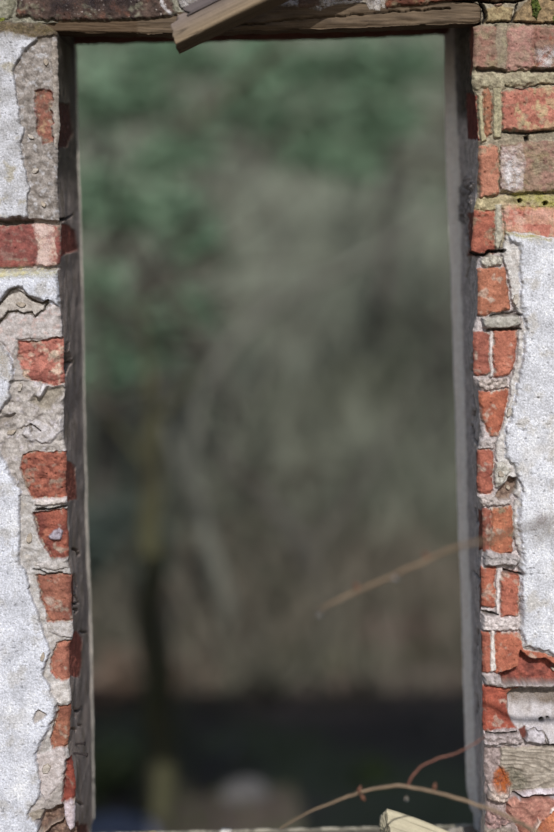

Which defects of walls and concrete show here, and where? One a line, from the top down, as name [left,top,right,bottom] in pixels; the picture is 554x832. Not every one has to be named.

crack [454,0,554,25]
flaking render [0,289,49,320]
crack [0,288,49,324]
flaking render [0,381,67,484]
flaking render [494,232,554,744]
flaking render [19,495,77,832]